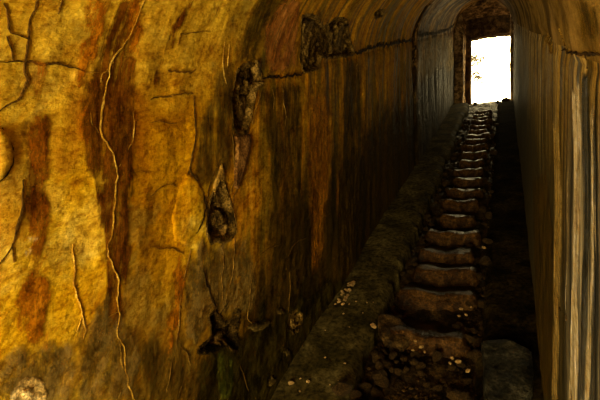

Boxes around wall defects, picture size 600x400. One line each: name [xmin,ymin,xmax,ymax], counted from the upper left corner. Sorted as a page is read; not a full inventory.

rust [77,0,108,88]
spalling [299,13,355,74]
rust [14,115,51,349]
crack [0,0,145,400]
spalling [206,60,264,245]
spalling [197,308,241,355]